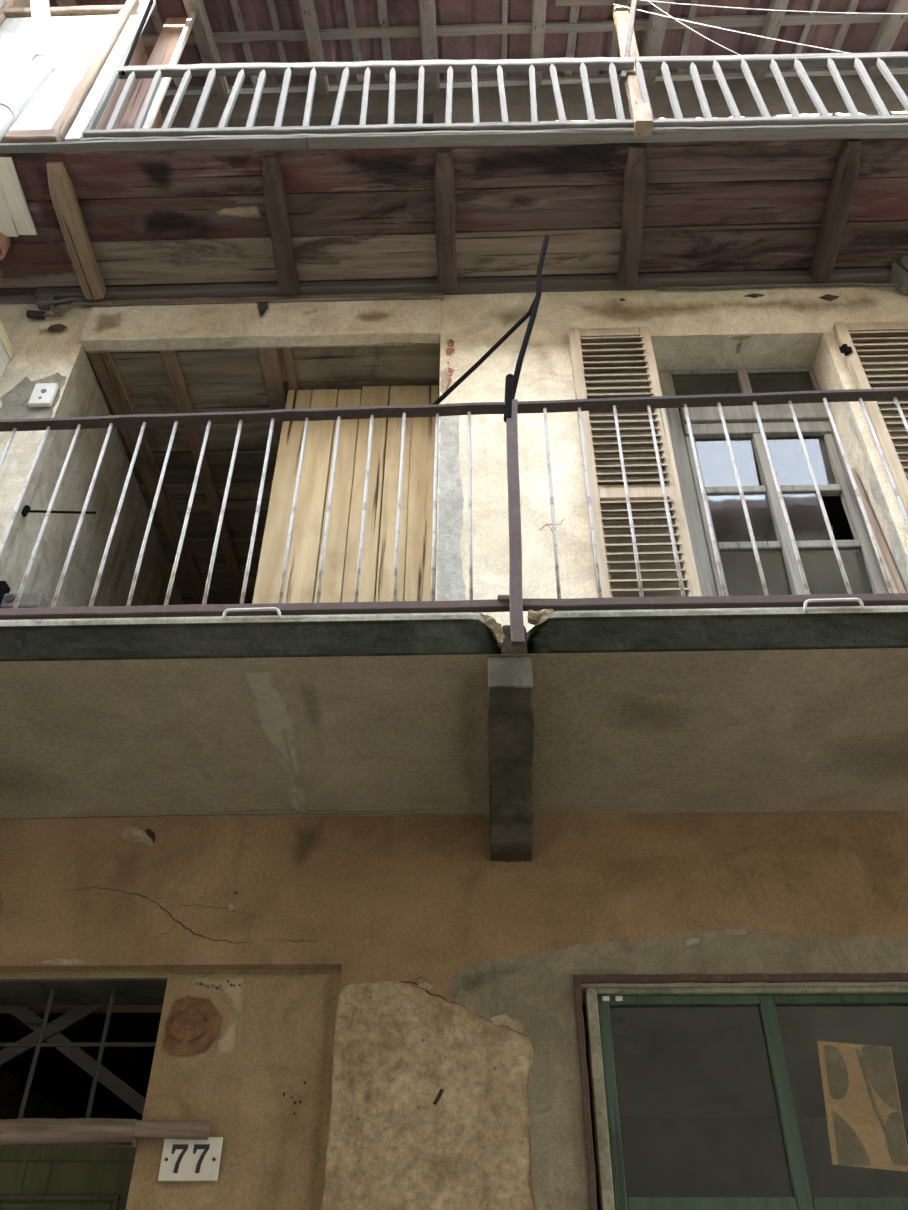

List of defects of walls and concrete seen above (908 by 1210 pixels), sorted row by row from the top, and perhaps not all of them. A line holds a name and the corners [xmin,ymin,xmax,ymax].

spalling [479,609,554,654]
water stain [240,670,308,813]
crack [23,809,457,819]
crack [69,887,317,944]
peeling [321,980,535,1210]